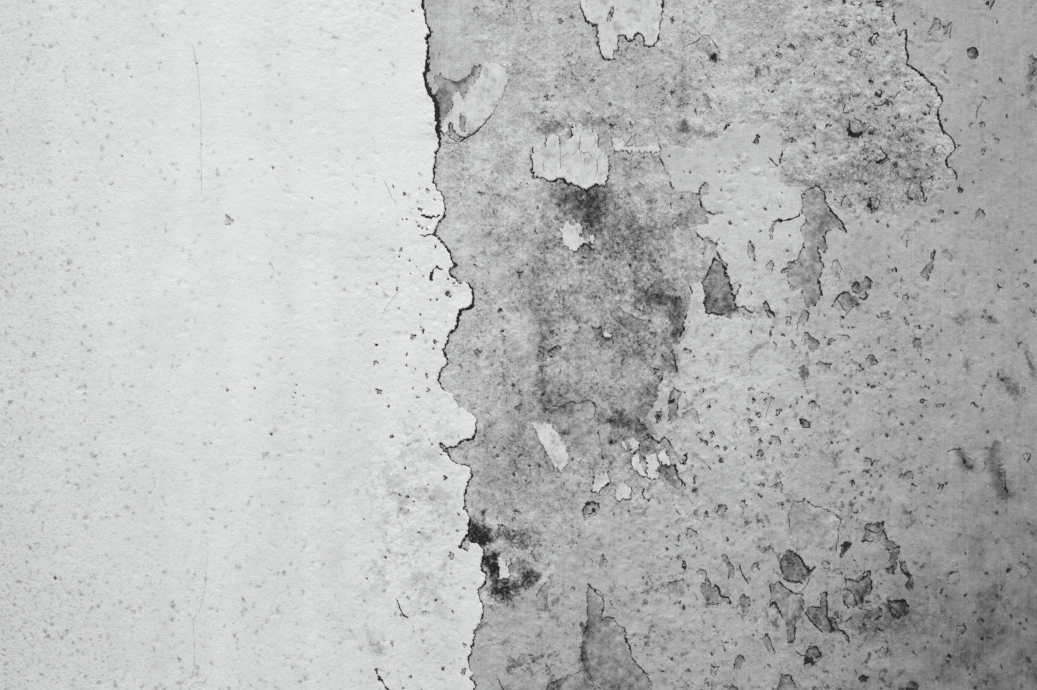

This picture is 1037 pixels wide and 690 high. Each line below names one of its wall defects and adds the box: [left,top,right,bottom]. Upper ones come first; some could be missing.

water stain [561,187,607,226]
water stain [639,288,680,312]
spalling [393,0,985,634]
water stain [468,510,540,605]
spalling [546,585,673,690]
peeling [707,639,745,686]
peeling [753,634,776,654]
peeling [777,674,796,690]
peeling [769,581,849,668]